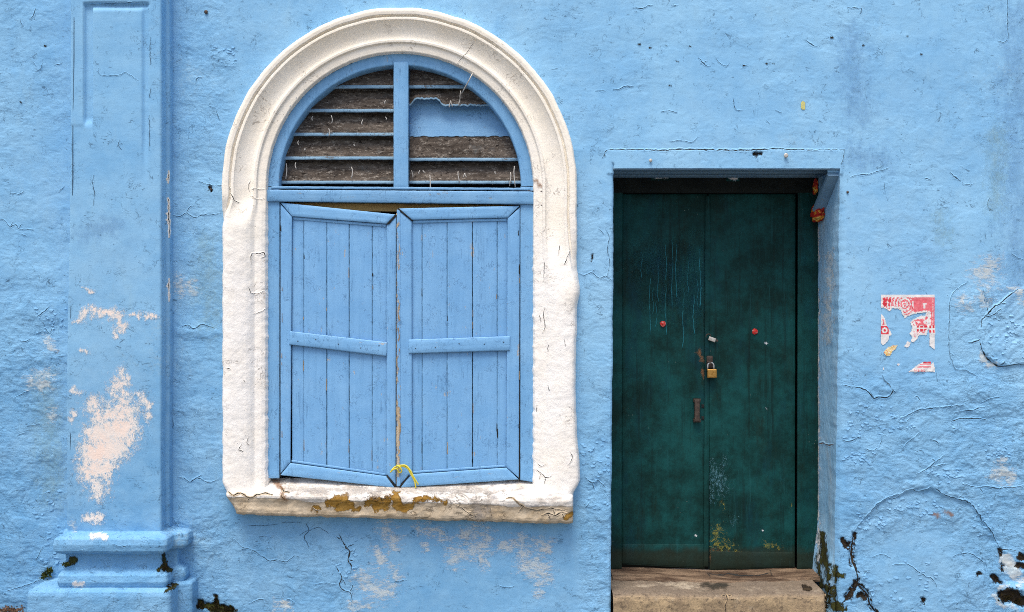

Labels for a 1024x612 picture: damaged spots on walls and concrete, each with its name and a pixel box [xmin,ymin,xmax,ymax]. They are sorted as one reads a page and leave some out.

peeling [34,287,160,340]
peeling [40,367,155,568]
crack [177,475,356,605]
spalling [311,490,448,515]
crack [818,281,1024,612]